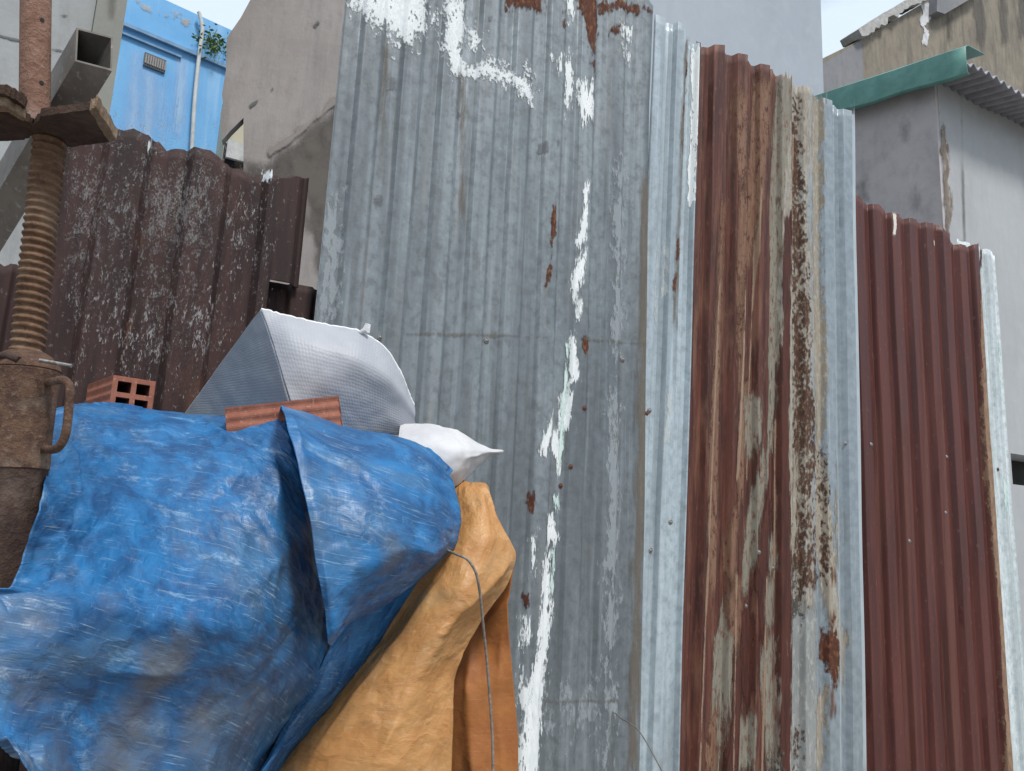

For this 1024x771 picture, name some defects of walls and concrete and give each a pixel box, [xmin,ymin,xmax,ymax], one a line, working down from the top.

corrosion [505,0,547,13]
corrosion [563,0,652,76]
corrosion [545,205,557,287]
corrosion [722,95,836,771]
corrosion [526,490,535,513]
corrosion [978,273,1014,771]
corrosion [819,612,840,718]